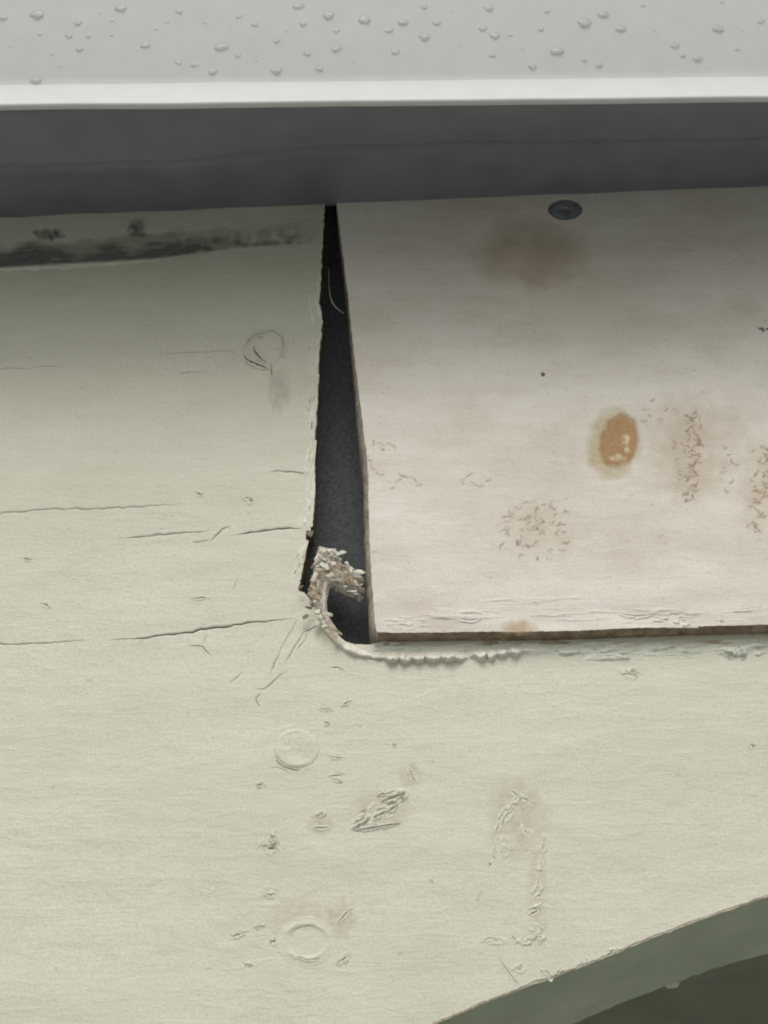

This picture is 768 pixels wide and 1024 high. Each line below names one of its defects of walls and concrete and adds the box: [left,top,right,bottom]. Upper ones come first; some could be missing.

damp [0,231,221,267]
corrosion [592,416,637,469]
crack [270,468,309,476]
peeling [292,274,768,681]
crack [0,503,182,515]
crack [117,524,302,544]
crack [0,639,84,647]
crack [111,618,297,655]
peeling [350,788,409,832]
peeling [432,790,768,1024]